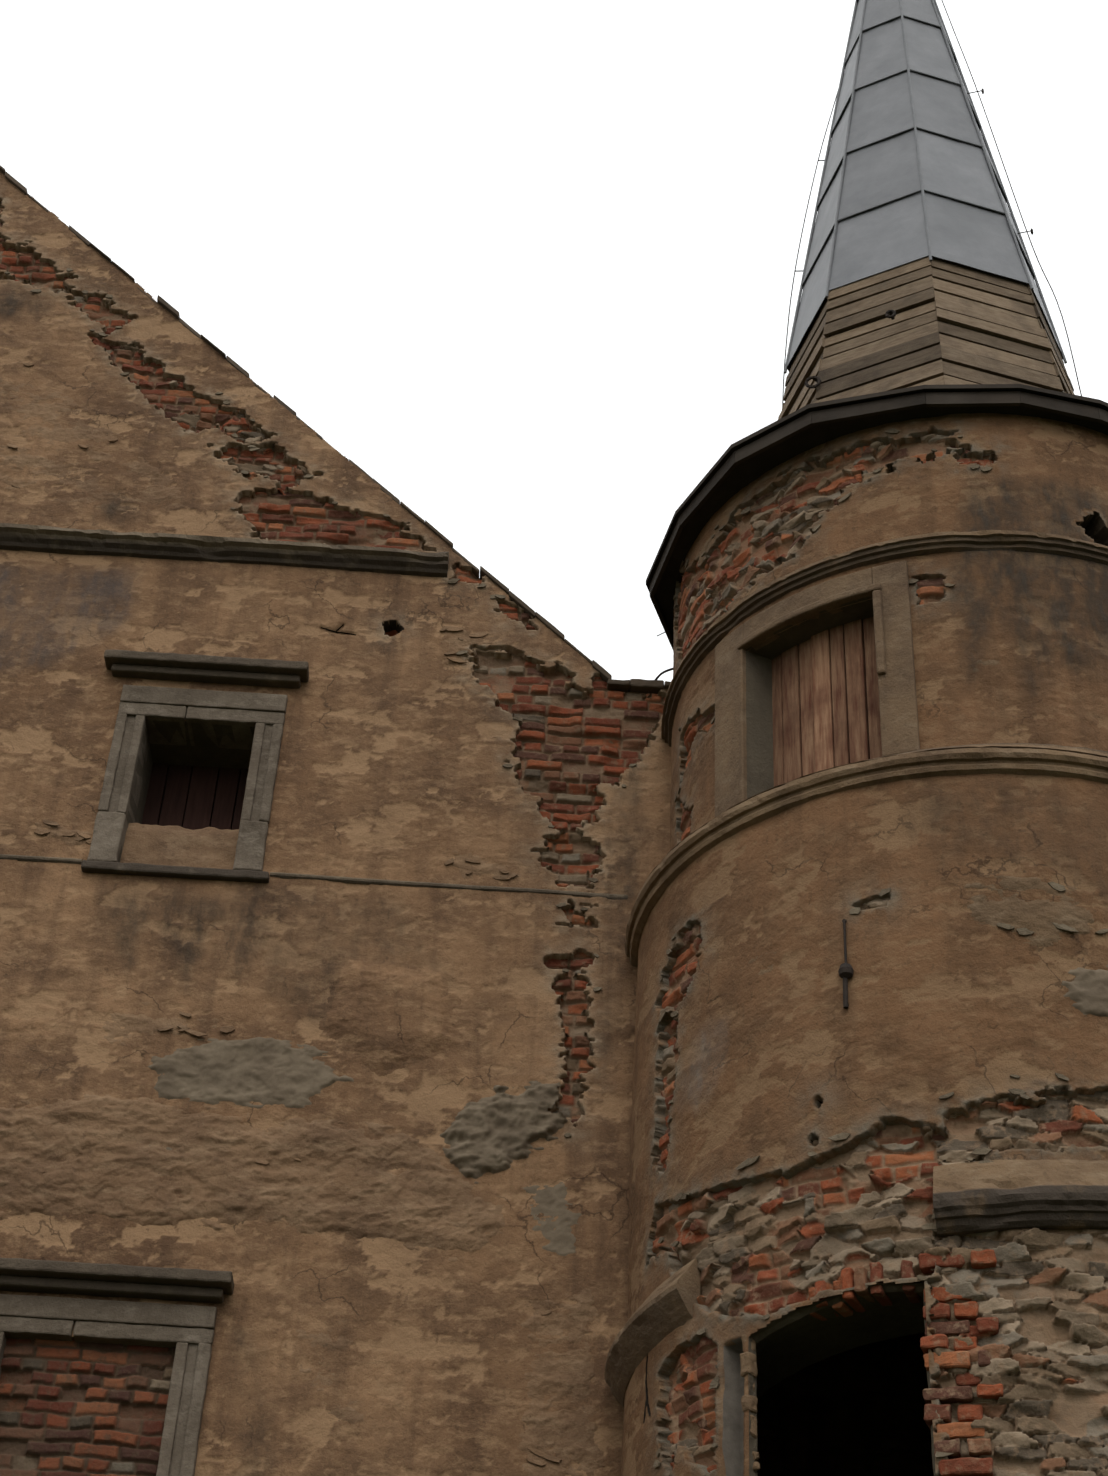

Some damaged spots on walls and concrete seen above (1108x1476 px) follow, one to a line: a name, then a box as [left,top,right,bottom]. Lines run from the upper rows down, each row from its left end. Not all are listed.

spalling [0,201,425,551]
spalling [448,566,535,630]
spalling [673,428,994,658]
spalling [440,623,665,930]
spalling [544,952,602,1138]
spalling [657,924,702,1171]
spalling [652,1073,1108,1476]